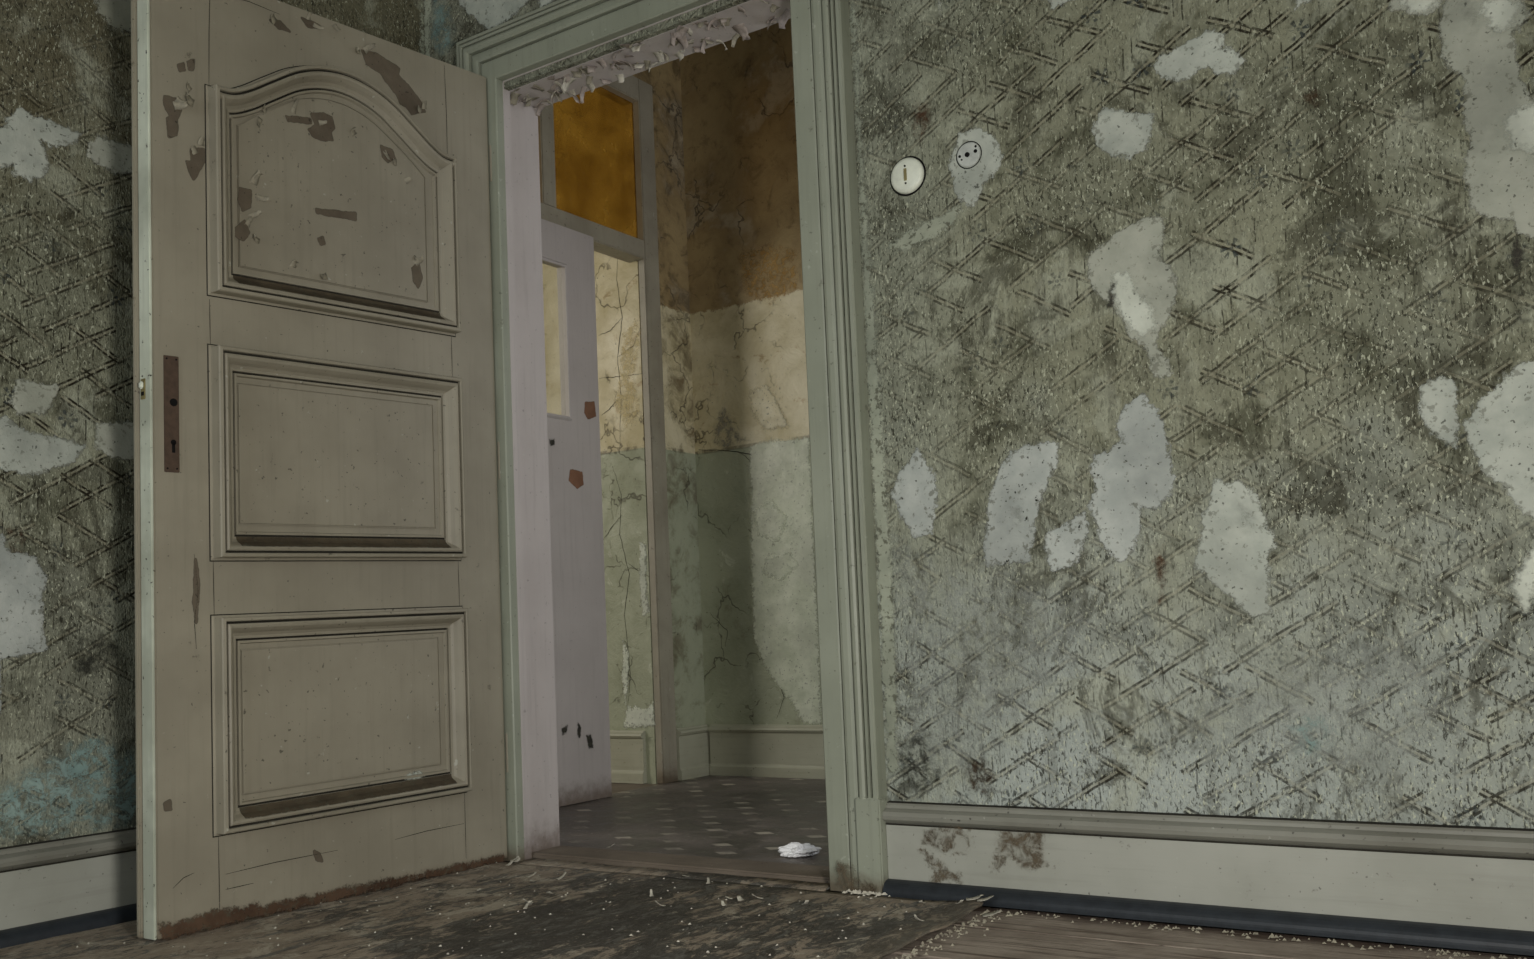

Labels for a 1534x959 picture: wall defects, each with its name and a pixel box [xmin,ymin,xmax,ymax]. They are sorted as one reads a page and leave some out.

flaking render [0,108,132,183]
peeling [285,112,357,142]
peeling [356,47,427,115]
flaking render [459,0,553,29]
flaking render [1388,0,1534,268]
flaking render [1087,216,1177,379]
flaking render [0,533,48,711]
flaking render [0,378,134,476]
flaking render [983,393,1176,572]
flaking render [1193,479,1277,617]
flaking render [1418,361,1534,520]
flaking render [1512,549,1534,613]